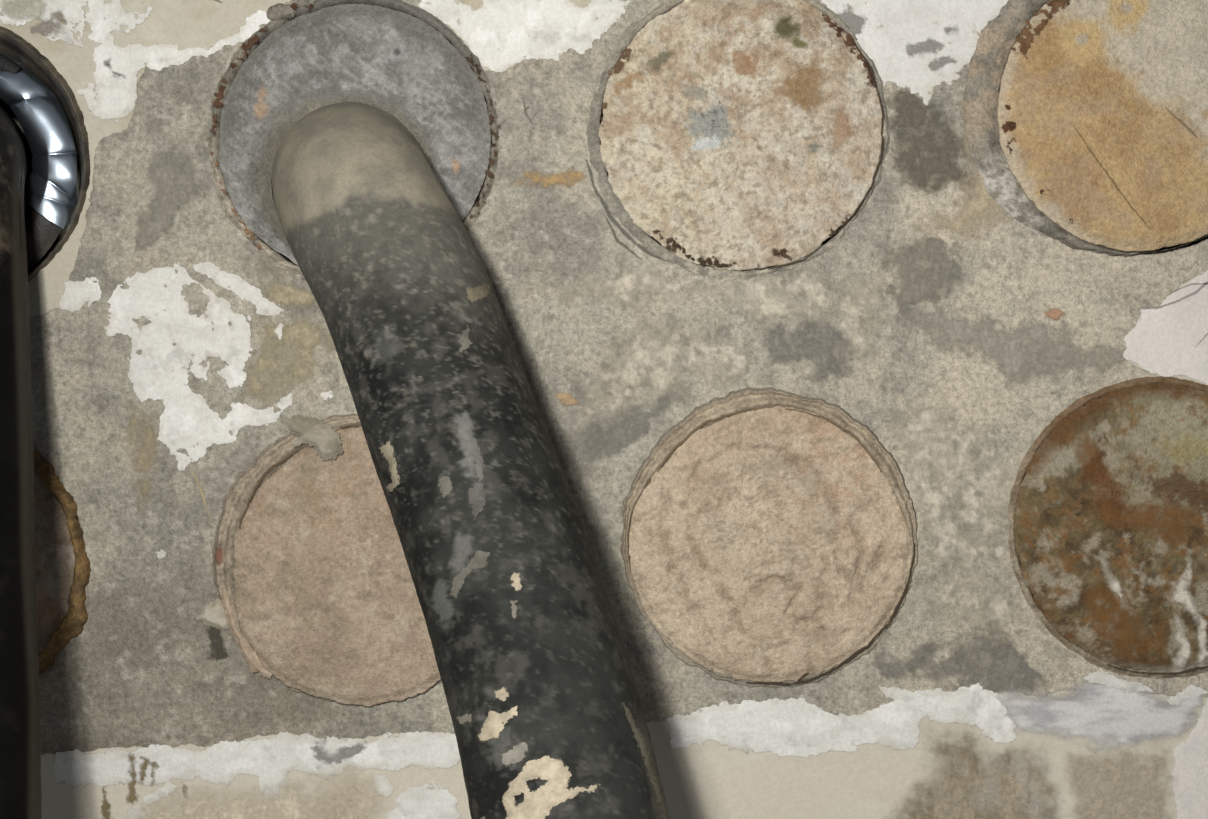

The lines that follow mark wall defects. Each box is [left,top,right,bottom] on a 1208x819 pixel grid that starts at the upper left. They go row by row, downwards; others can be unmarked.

corrosion [1011,0,1070,58]
corrosion [1002,104,1016,152]
spalling [0,0,461,819]
spalling [402,0,1208,819]
damp [907,741,1054,819]
damp [1073,752,1164,819]